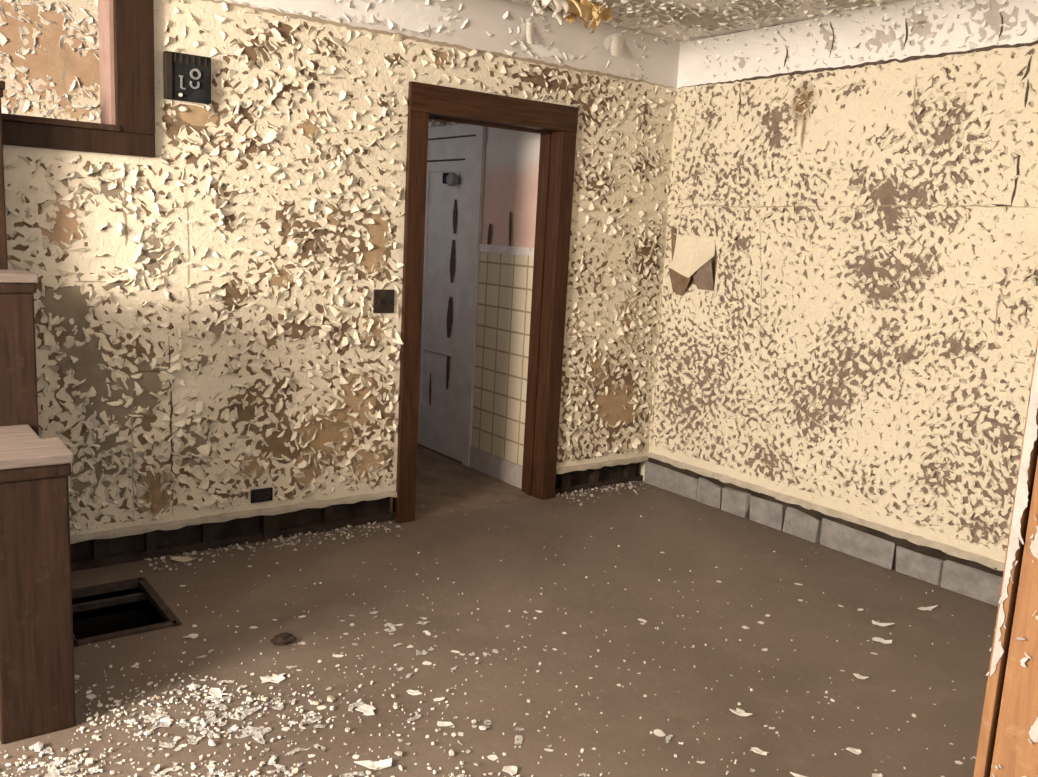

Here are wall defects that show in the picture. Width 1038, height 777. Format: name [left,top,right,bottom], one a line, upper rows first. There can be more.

peeling [0,0,480,531]